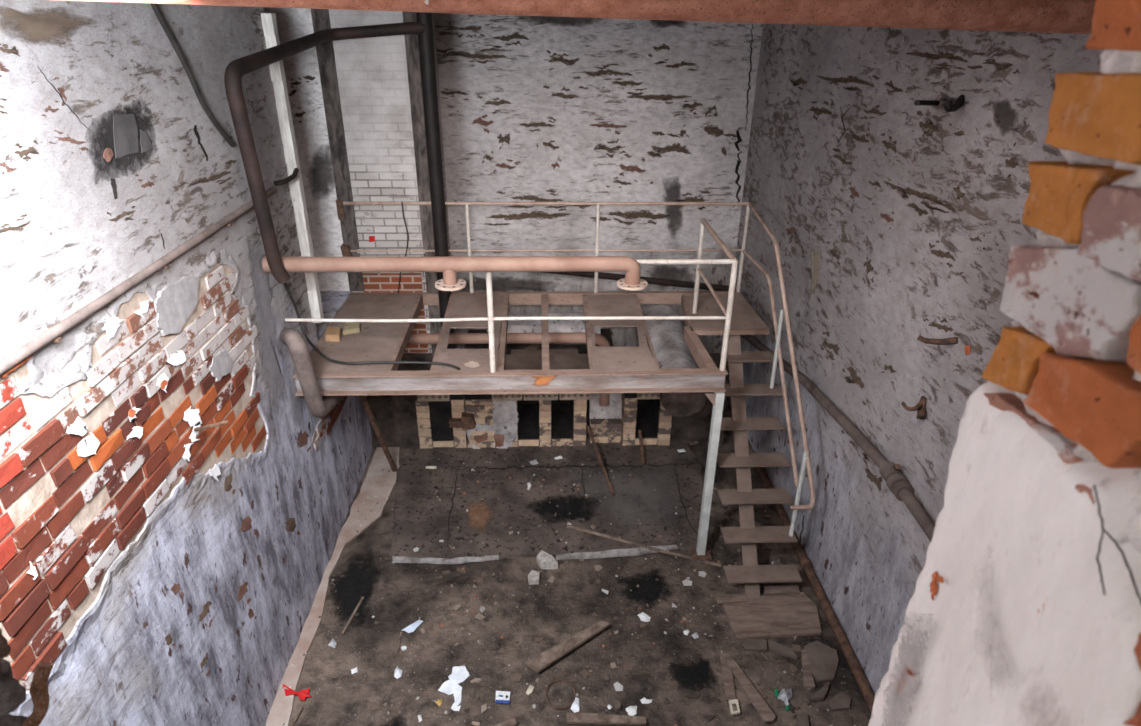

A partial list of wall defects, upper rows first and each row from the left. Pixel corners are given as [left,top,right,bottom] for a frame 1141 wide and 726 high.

peeling [437,24,529,64]
peeling [441,89,562,173]
peeling [543,49,737,188]
crack [733,24,753,207]
peeling [790,76,903,156]
peeling [485,189,668,226]
peeling [868,181,965,224]
spalling [982,0,1141,555]
spalling [465,401,519,449]
spalling [0,248,270,716]
crack [1094,485,1141,604]
spalling [1123,701,1141,726]